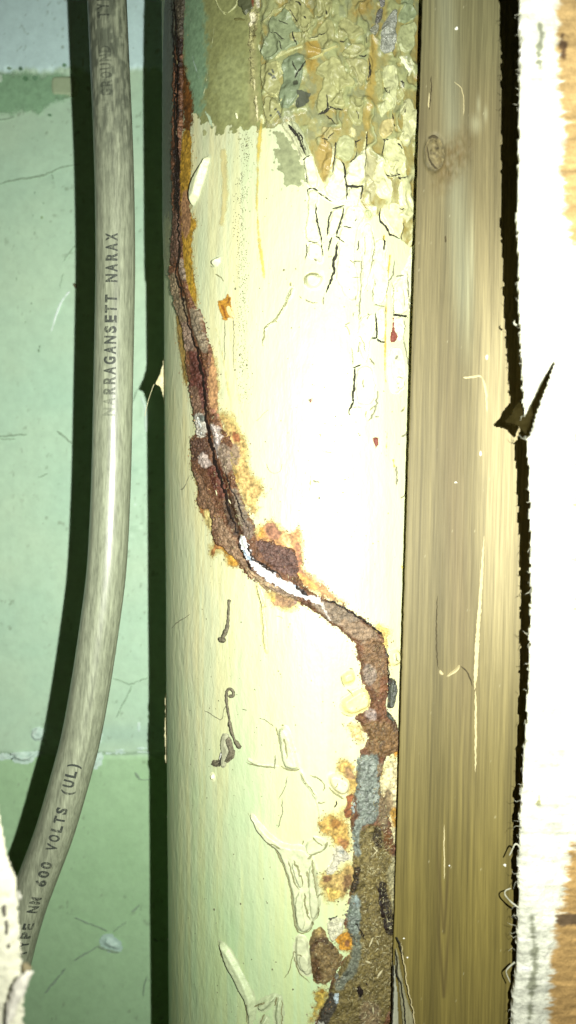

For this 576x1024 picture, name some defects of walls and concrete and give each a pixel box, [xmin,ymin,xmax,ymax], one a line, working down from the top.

corrosion [220,150,228,225]
corrosion [256,124,265,275]
peeling [215,0,422,407]
corrosion [218,294,235,394]
crack [162,0,415,1024]